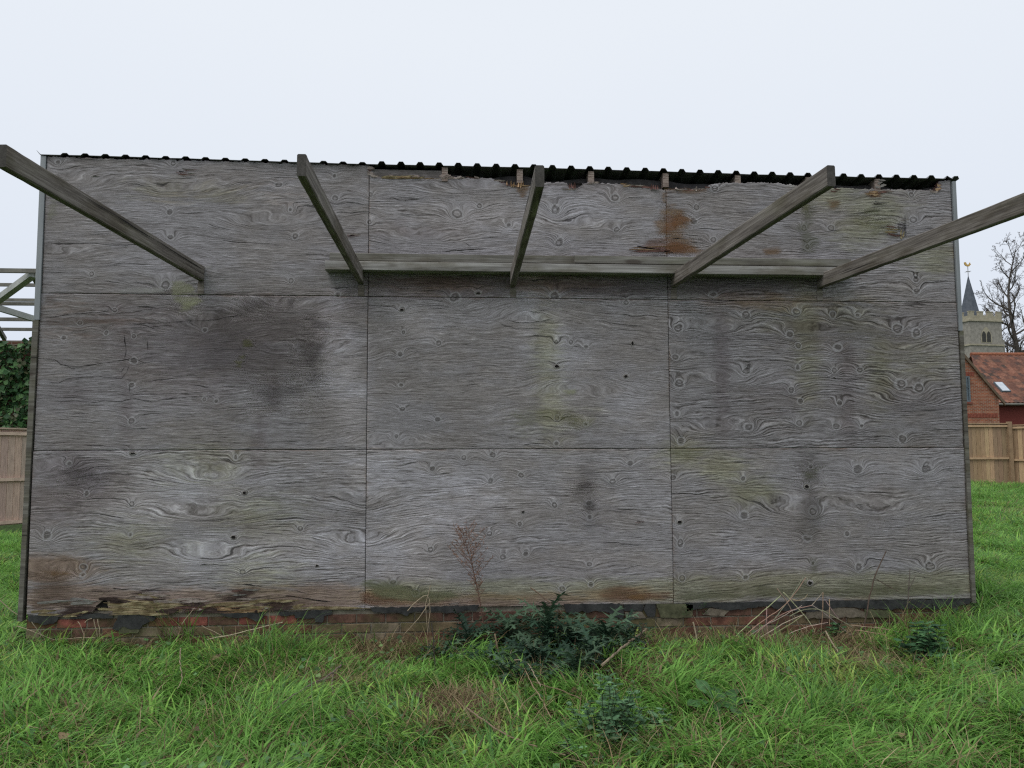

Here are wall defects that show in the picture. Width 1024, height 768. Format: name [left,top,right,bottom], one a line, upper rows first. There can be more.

spalling [28,588,333,633]